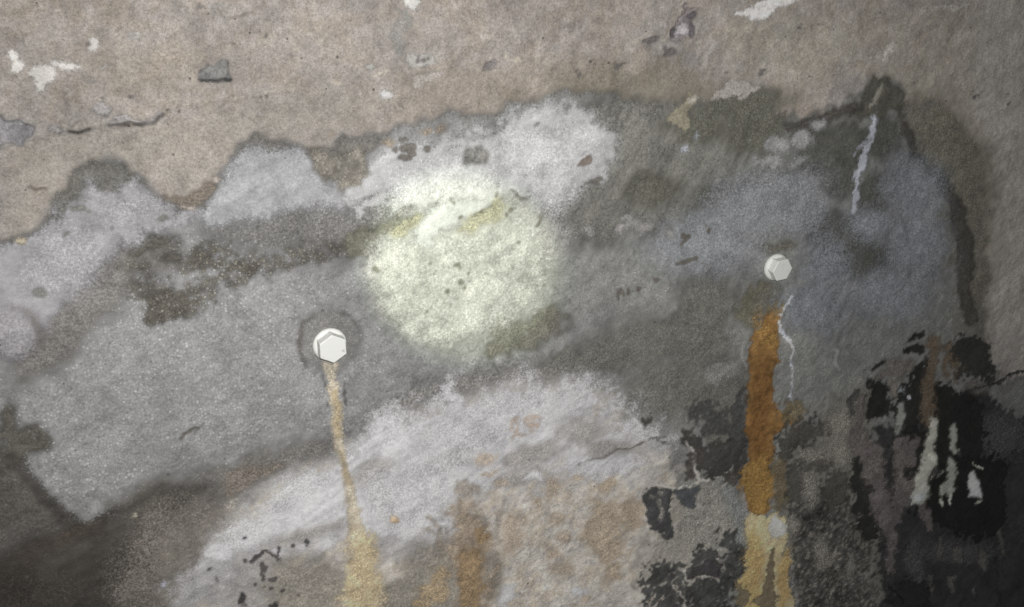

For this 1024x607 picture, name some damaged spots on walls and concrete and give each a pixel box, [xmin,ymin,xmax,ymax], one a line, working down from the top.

rust [323,362,389,607]
rust [733,301,805,607]
leakage [861,389,899,443]
leakage [480,529,518,607]
leakage [814,529,854,570]
leakage [846,531,886,607]